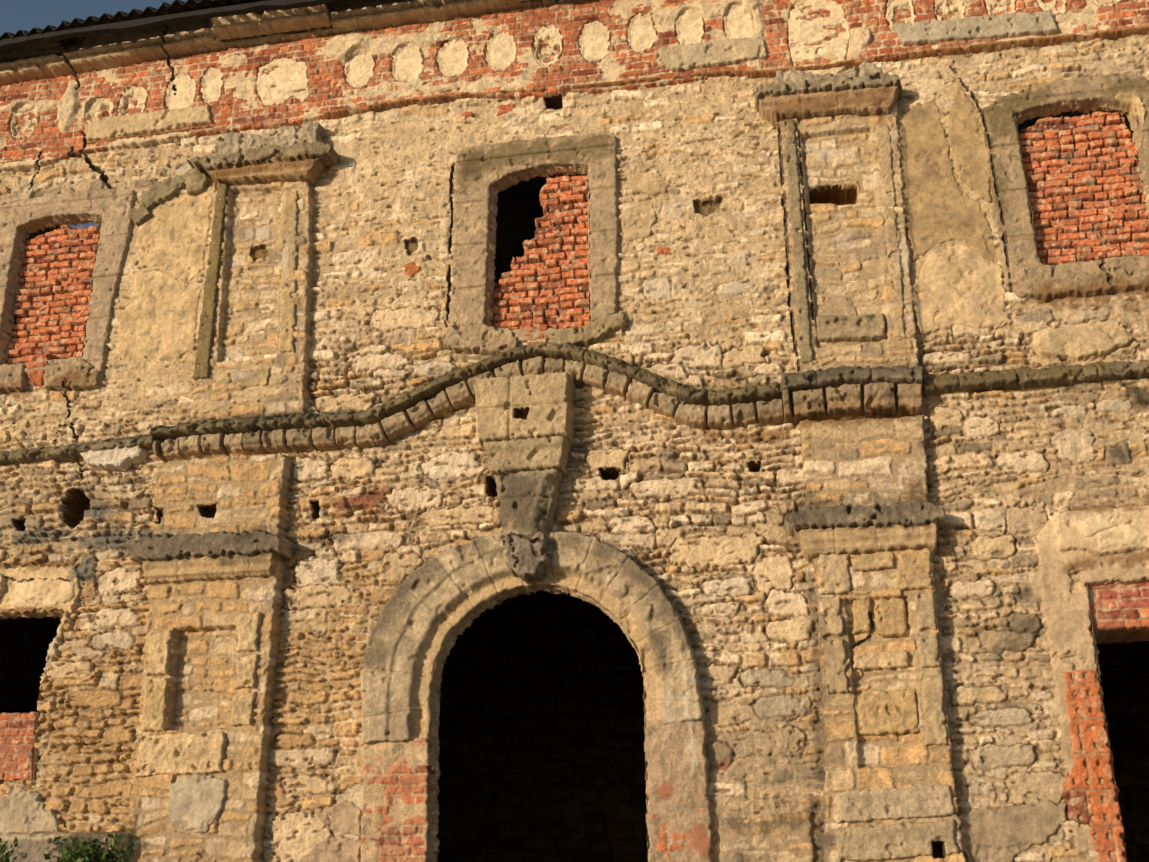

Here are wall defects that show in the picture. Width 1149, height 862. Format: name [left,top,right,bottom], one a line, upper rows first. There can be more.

crack [62,49,80,90]
crack [160,25,177,95]
crack [28,131,112,190]
crack [949,66,1012,293]
crack [53,377,84,492]
crack [2,575,71,583]